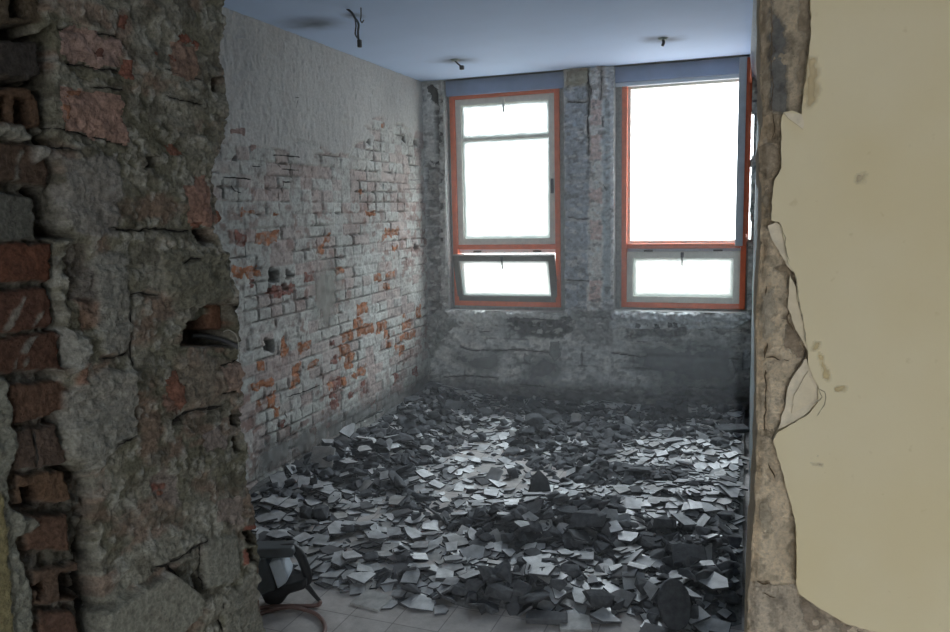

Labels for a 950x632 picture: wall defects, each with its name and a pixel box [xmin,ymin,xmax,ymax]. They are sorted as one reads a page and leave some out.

flaking render [59,15,135,80]
flaking render [60,86,130,146]
crack [570,69,603,154]
crack [111,225,188,233]
spalling [234,229,279,247]
spalling [382,226,399,252]
spalling [231,265,261,288]
spalling [265,271,315,299]
spalling [747,0,874,632]
spalling [280,302,421,410]
crack [172,391,236,422]
flaking render [220,360,285,428]